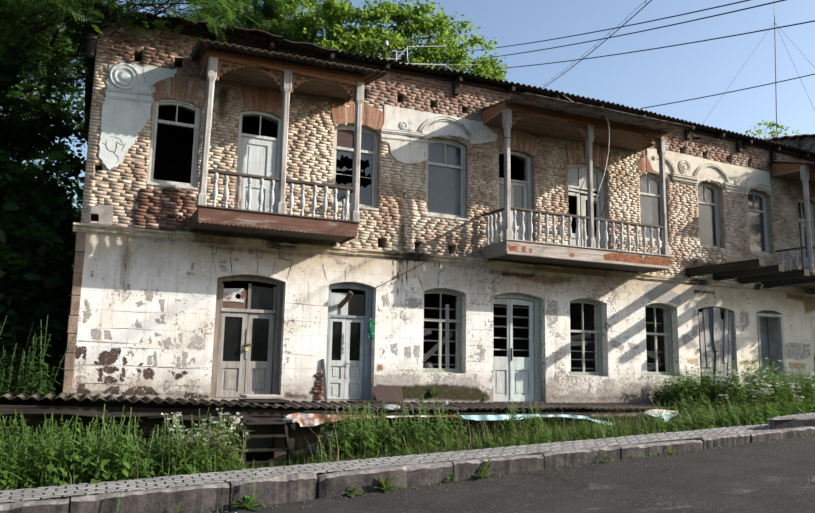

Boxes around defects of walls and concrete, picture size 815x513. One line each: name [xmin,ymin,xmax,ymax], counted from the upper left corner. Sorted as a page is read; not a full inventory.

peeling [644,283,682,304]
peeling [403,297,422,322]
peeling [682,310,699,350]
spalling [75,291,205,396]
peeling [390,343,420,358]
peeling [609,337,639,351]
peeling [373,374,420,386]